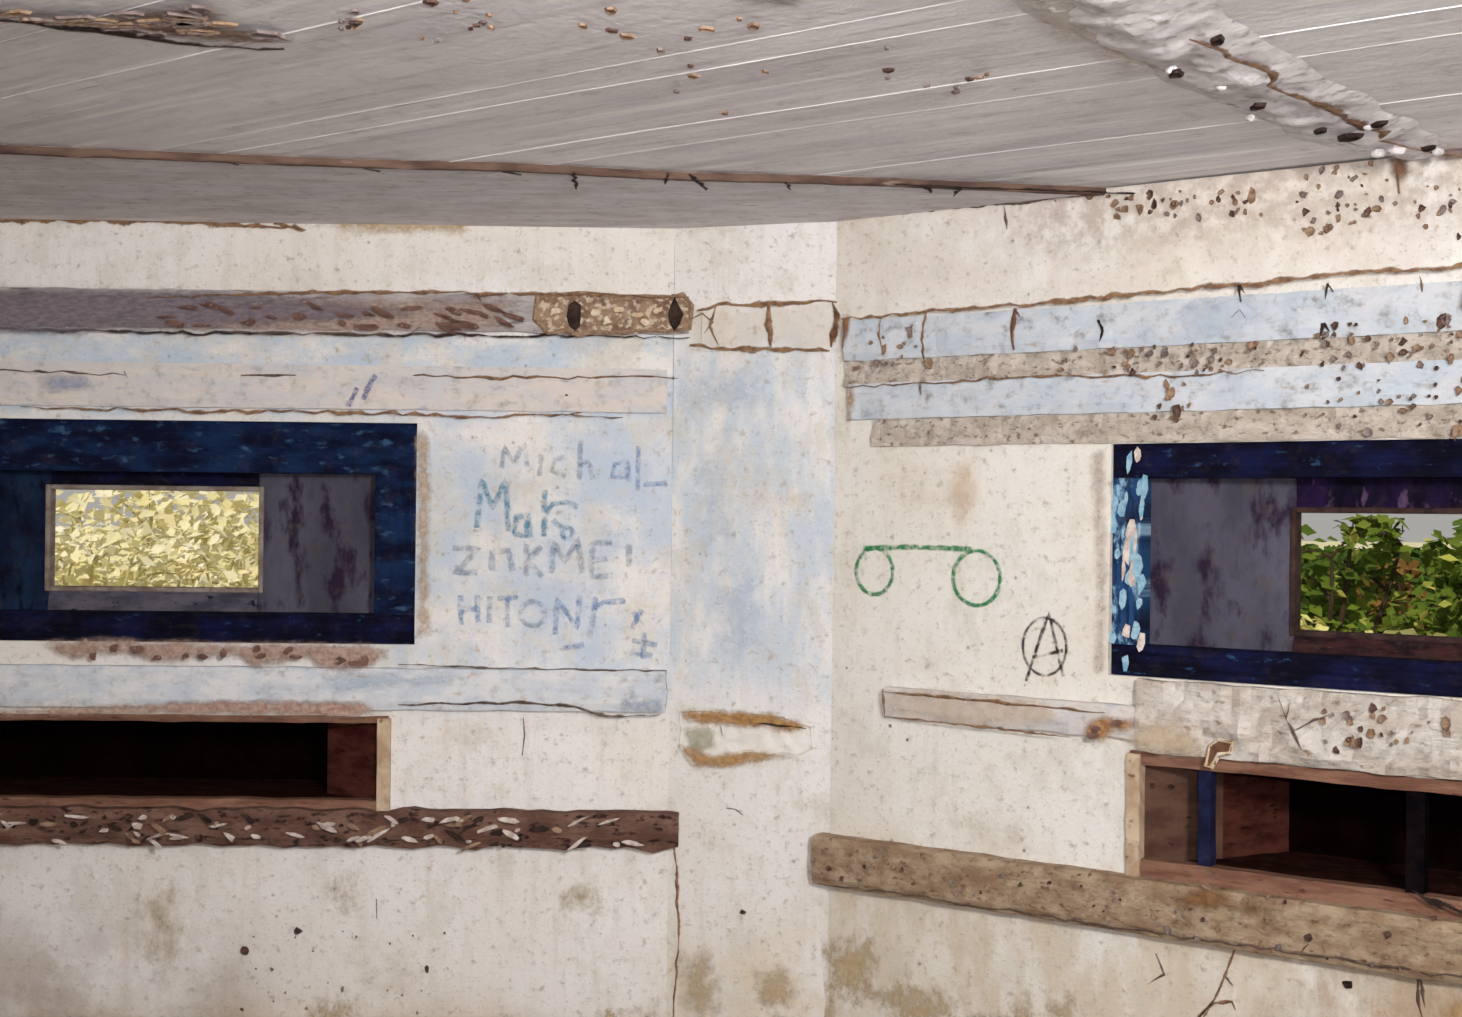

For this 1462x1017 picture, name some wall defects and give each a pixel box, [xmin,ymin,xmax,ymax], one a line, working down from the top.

spalling [0,4,293,50]
rust [1391,158,1407,194]
crack [841,262,1462,394]
spalling [679,709,814,767]
peeling [0,812,644,851]
damp [823,940,950,1017]
crack [818,883,1462,1017]